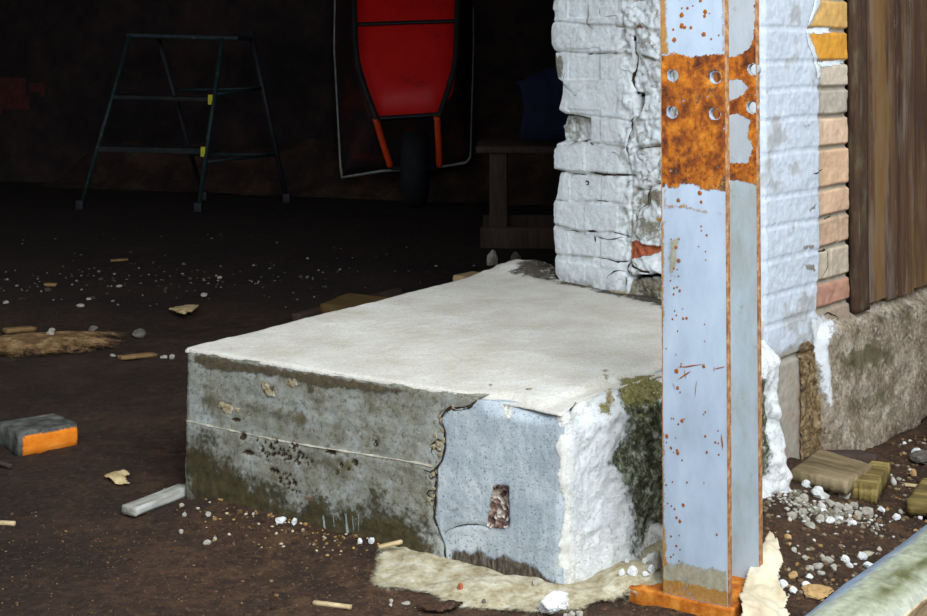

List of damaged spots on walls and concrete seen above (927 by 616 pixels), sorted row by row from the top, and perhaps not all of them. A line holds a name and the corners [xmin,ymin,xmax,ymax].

crack [586,0,659,88]
crack [561,117,661,288]
flaking render [631,240,661,259]
rust [660,0,763,608]
damp [273,409,306,424]
damp [185,429,439,554]
crack [423,400,484,557]
damp [452,549,555,584]